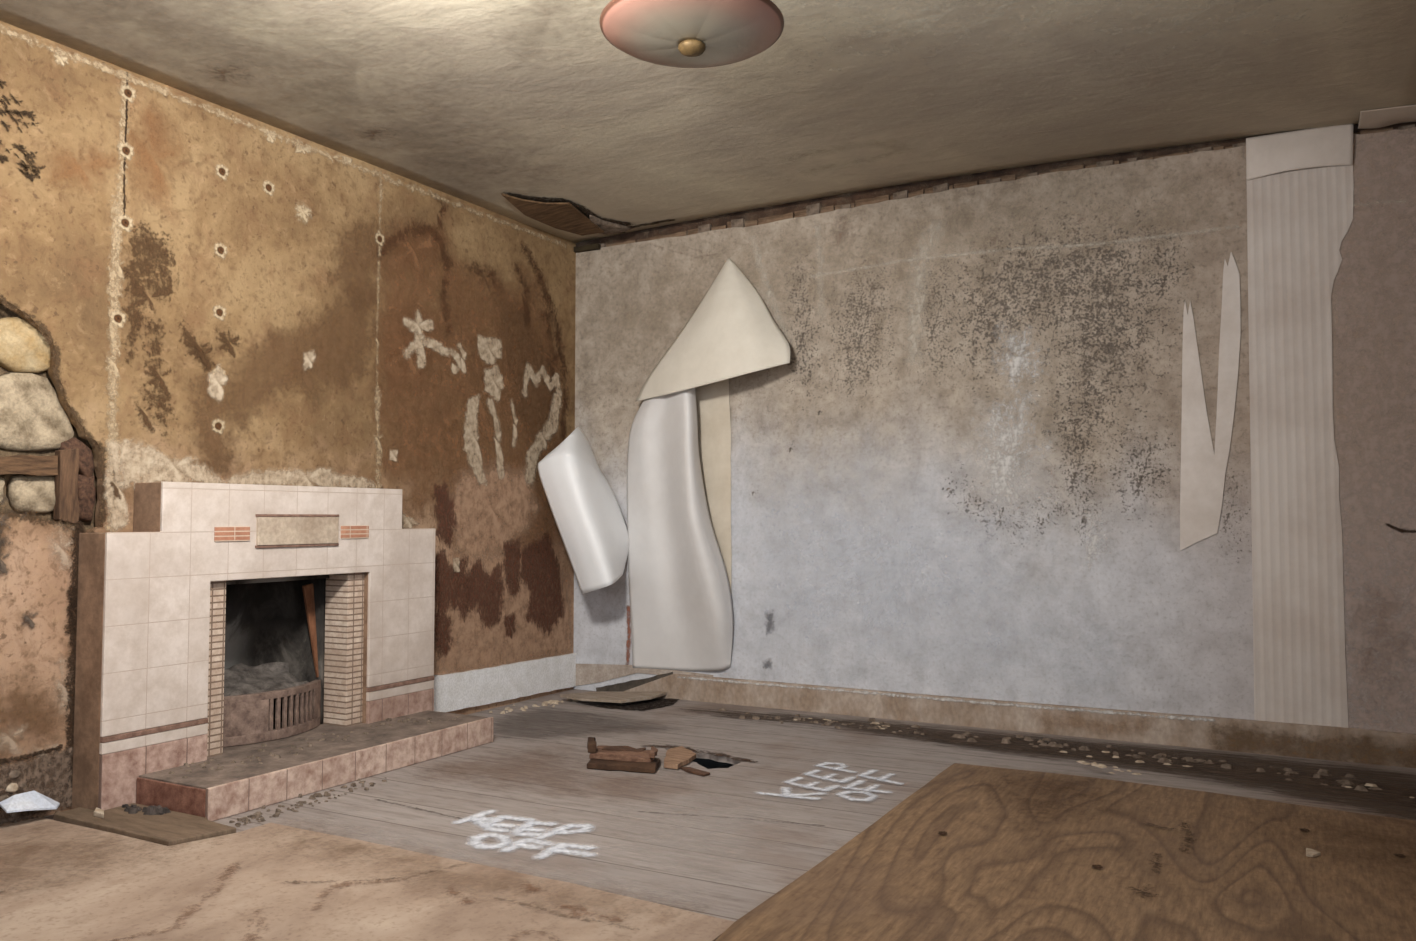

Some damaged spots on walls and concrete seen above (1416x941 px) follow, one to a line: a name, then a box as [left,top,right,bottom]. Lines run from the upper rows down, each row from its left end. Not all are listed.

flaking render [1,27,566,248]
flaking render [0,295,375,565]
damp [122,202,572,673]
damp [687,133,1416,820]